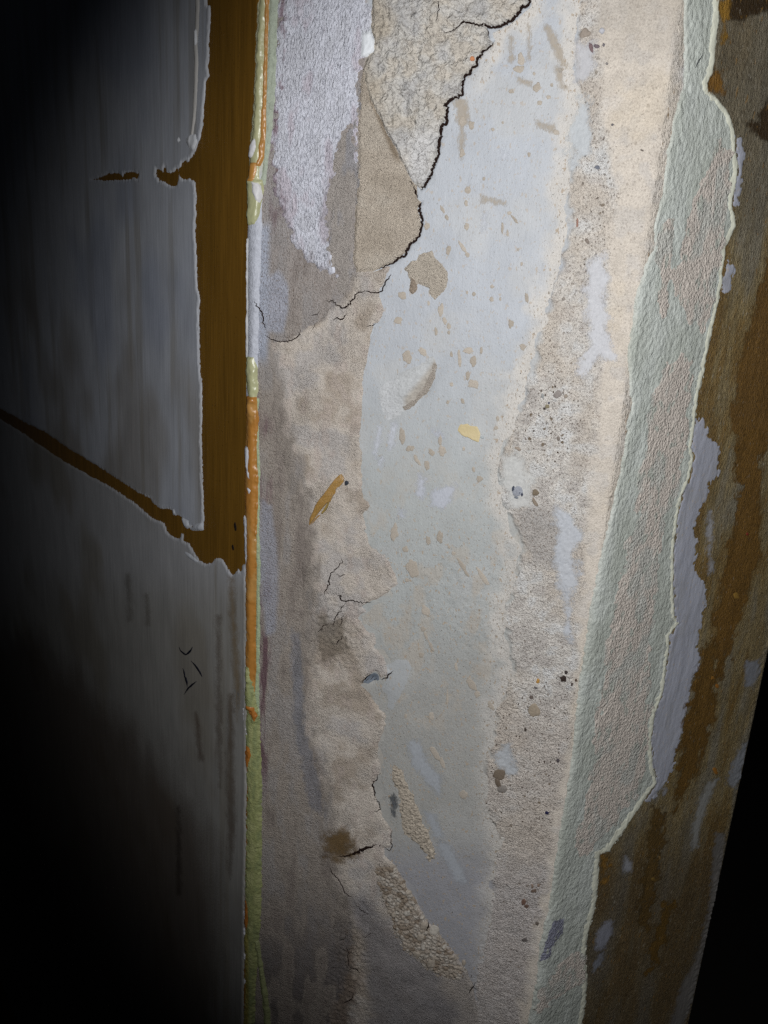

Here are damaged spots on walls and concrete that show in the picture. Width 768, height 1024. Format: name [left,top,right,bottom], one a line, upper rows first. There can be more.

peeling [177,134,197,150]
crack [254,0,531,343]
rust [708,70,724,94]
rust [718,0,731,45]
crack [318,559,371,644]
spalling [251,0,605,1010]
peeling [521,0,739,1024]
rust [636,258,768,977]